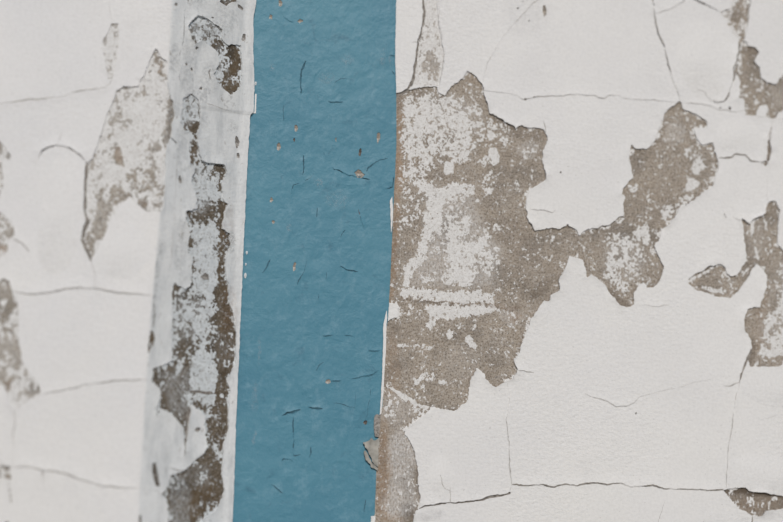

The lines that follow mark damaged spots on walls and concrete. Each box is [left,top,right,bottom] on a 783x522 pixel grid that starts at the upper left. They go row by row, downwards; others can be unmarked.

crack [3,80,112,103]
peeling [189,16,245,95]
crack [391,0,445,96]
crack [483,43,745,112]
peeling [721,0,783,119]
crack [18,135,155,328]
peeling [84,49,236,522]
peeling [363,0,718,522]
peeling [688,201,783,367]
crack [0,410,136,488]
crack [419,349,752,521]
peeling [724,487,783,516]